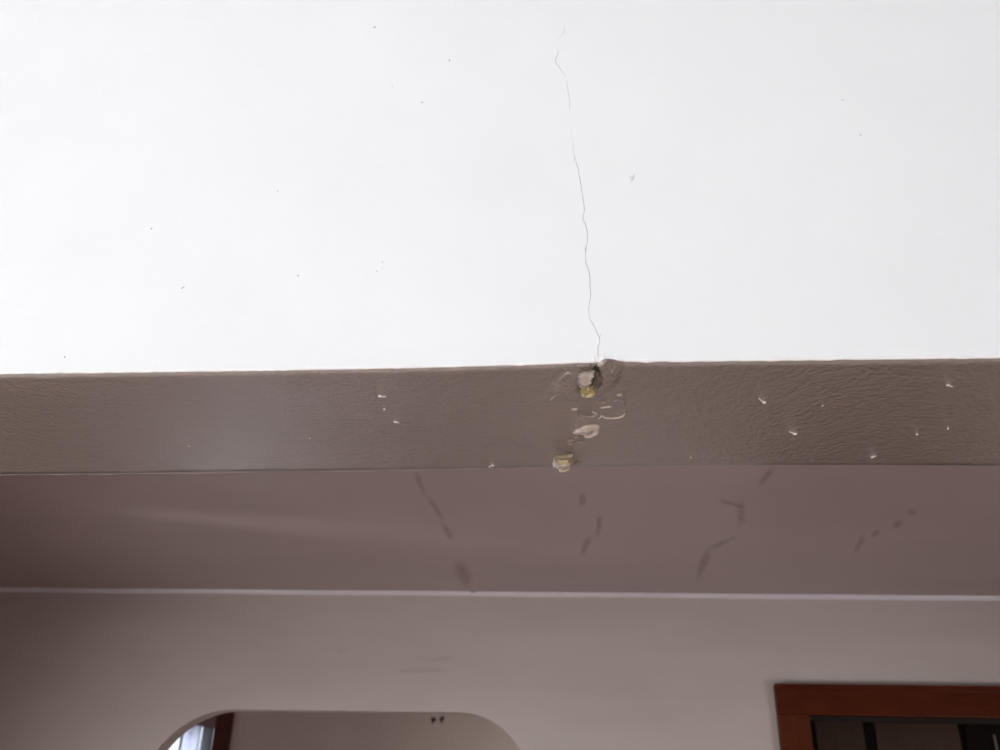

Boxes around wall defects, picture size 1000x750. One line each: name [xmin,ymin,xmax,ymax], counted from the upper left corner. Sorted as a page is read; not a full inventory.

crack [574,156,601,359]
flaking render [547,355,624,402]
peeling [567,424,600,446]